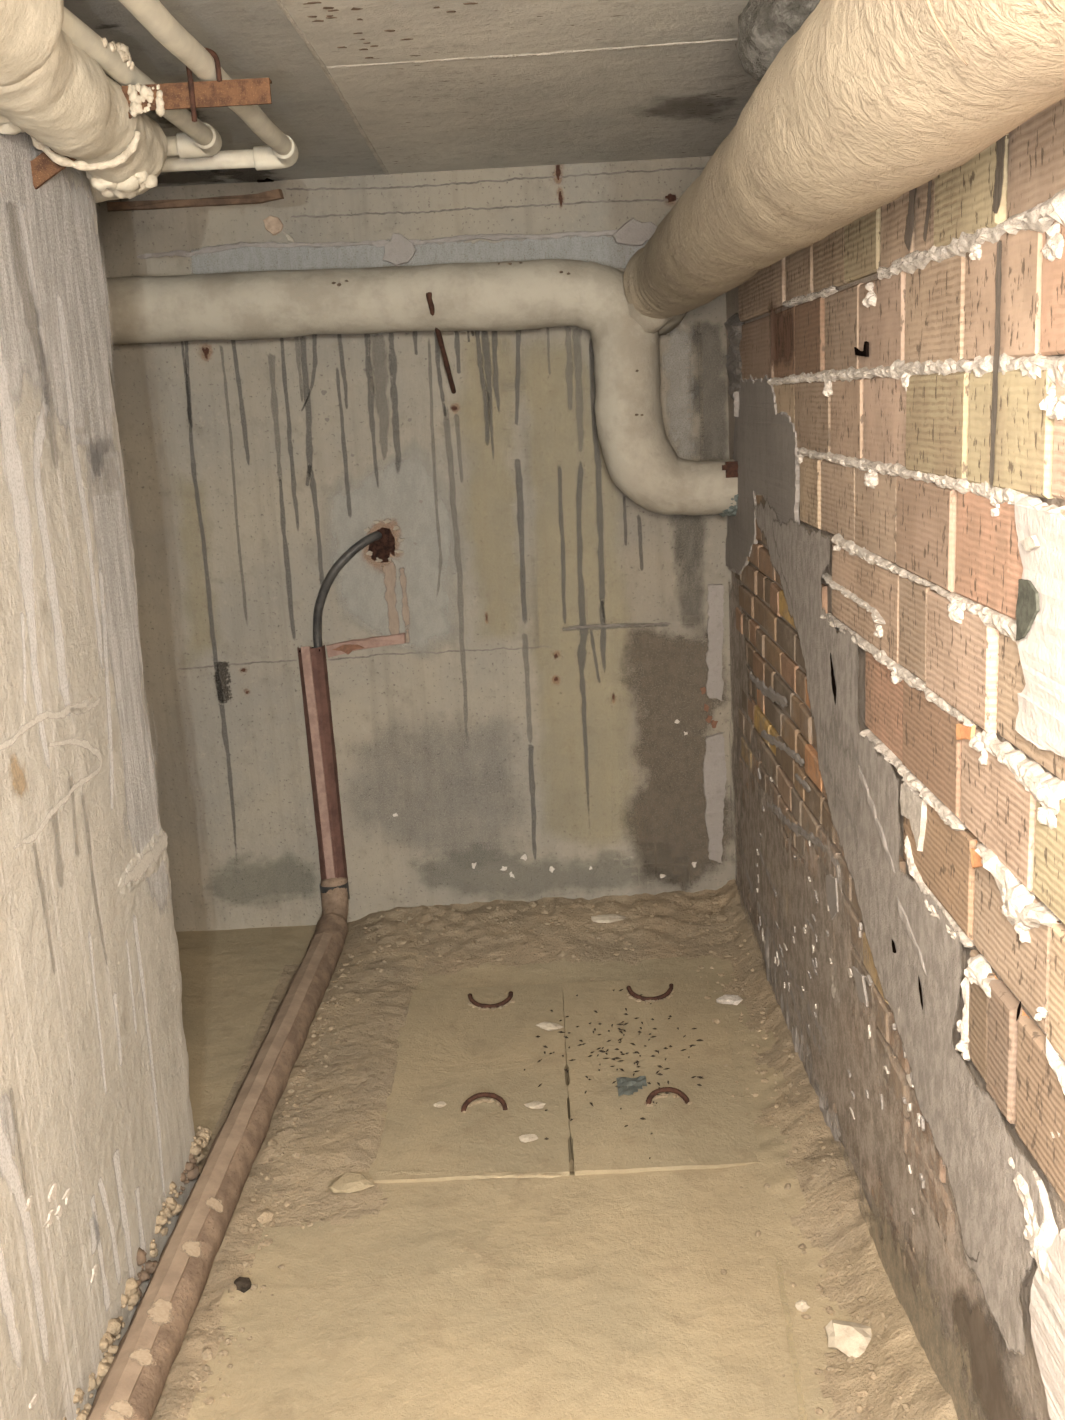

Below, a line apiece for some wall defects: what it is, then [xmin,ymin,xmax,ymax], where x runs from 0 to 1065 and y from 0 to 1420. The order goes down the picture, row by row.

damp [0,132,160,854]
damp [181,341,236,846]
damp [157,168,276,184]
corrosion [303,2,413,59]
damp [268,330,521,738]
damp [547,327,606,809]
damp [626,515,731,888]
peeling [716,995,743,1005]
peeling [700,313,800,863]
spalling [854,341,869,357]
peeling [900,782,927,852]
peeling [1015,493,1065,758]